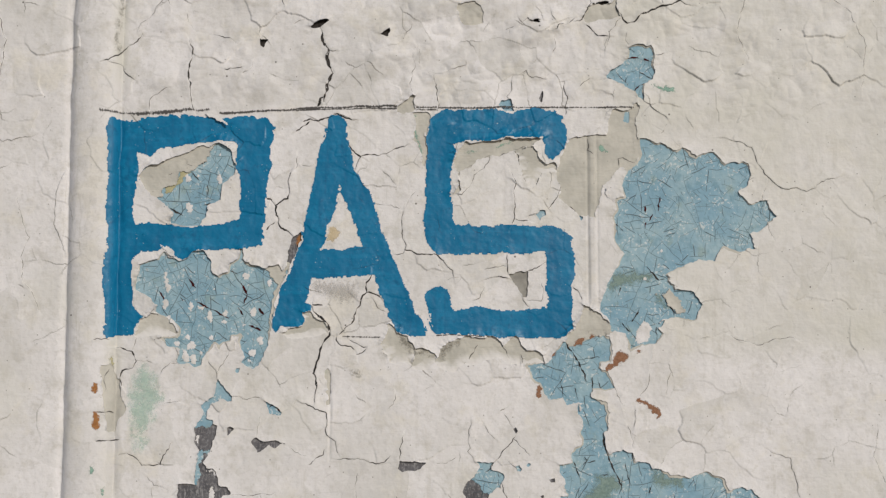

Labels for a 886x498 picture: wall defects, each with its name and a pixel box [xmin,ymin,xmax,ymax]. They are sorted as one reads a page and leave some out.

crack [296,29,352,131]
crack [508,0,687,125]
peeling [137,140,238,228]
crack [266,159,305,233]
peeling [177,380,234,498]
crack [160,271,264,331]
peeling [132,232,331,373]
crack [293,275,403,484]
peeling [377,40,790,498]
crack [560,343,636,497]
rust [605,350,641,371]
rust [636,398,661,419]